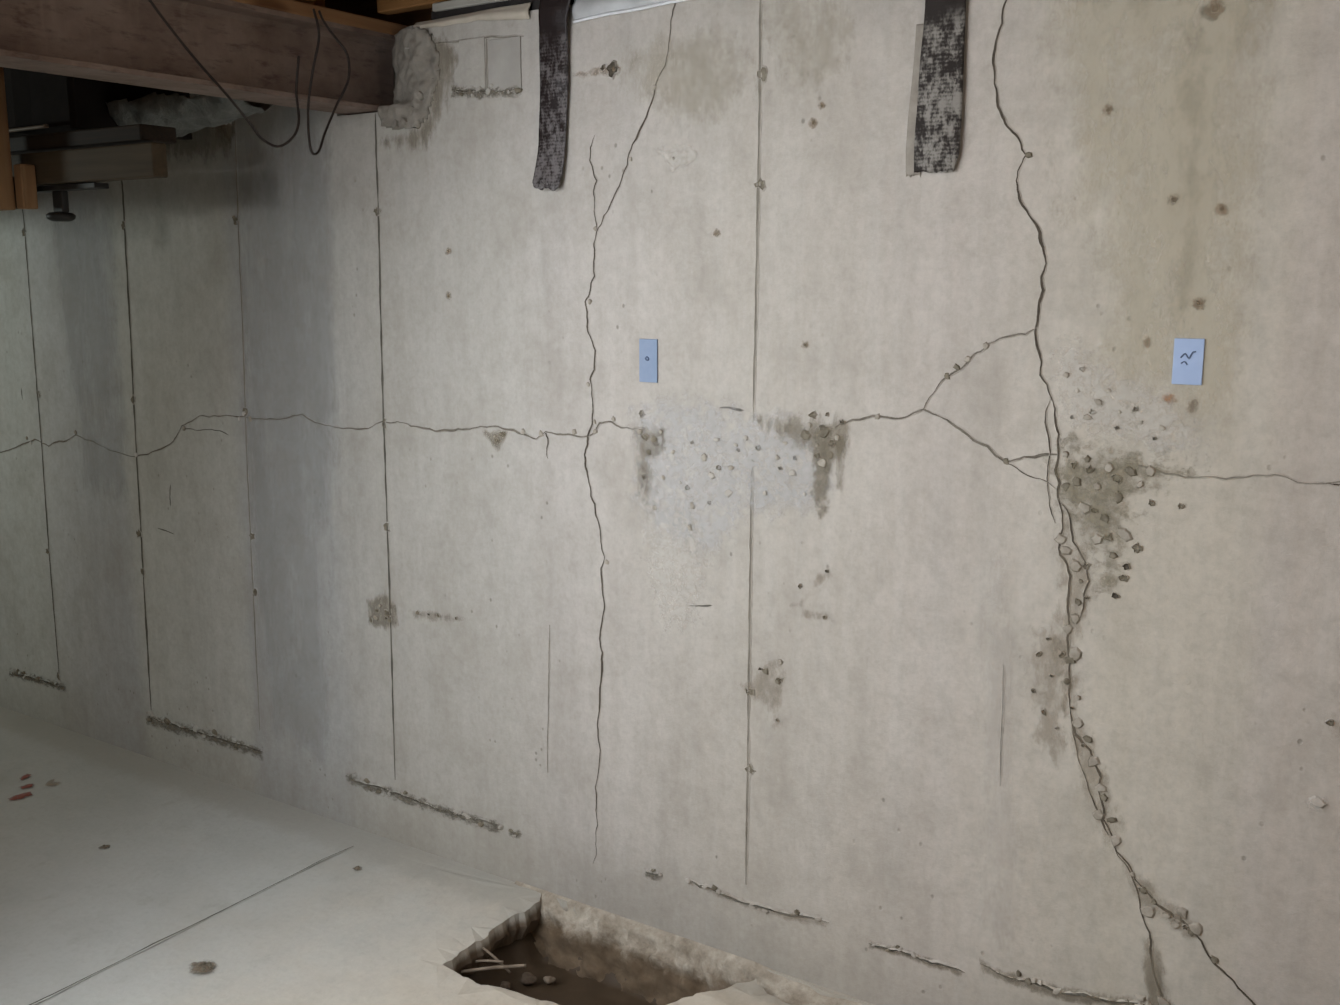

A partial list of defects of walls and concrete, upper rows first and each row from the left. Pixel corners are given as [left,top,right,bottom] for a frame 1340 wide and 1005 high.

crack [0,3,677,864]
spalling [369,596,396,626]
crack [835,0,1258,1005]
crack [1127,462,1340,486]